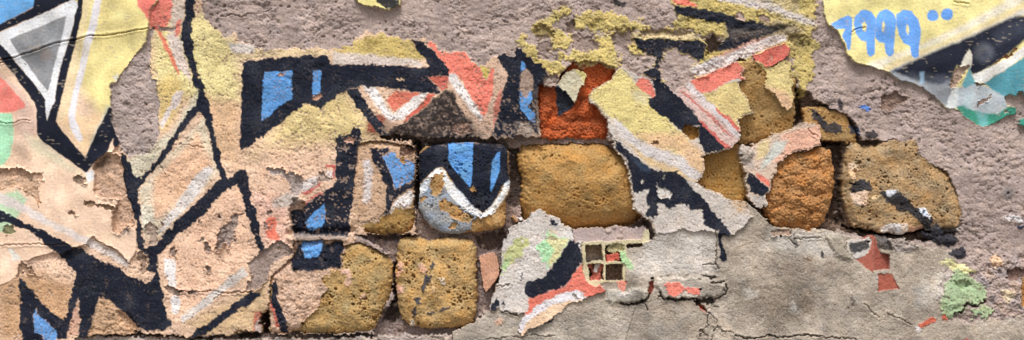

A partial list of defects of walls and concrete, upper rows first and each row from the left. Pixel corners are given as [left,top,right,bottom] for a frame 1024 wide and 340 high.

peeling [520,69,534,98]
spalling [881,90,908,112]
spalling [0,166,45,209]
spalling [69,26,178,273]
peeling [267,166,334,197]
peeling [360,172,507,233]
peeling [762,109,856,208]
peeling [849,162,934,235]
crack [787,223,932,246]
peeling [395,261,450,326]
crack [620,231,853,340]
crack [864,304,912,325]